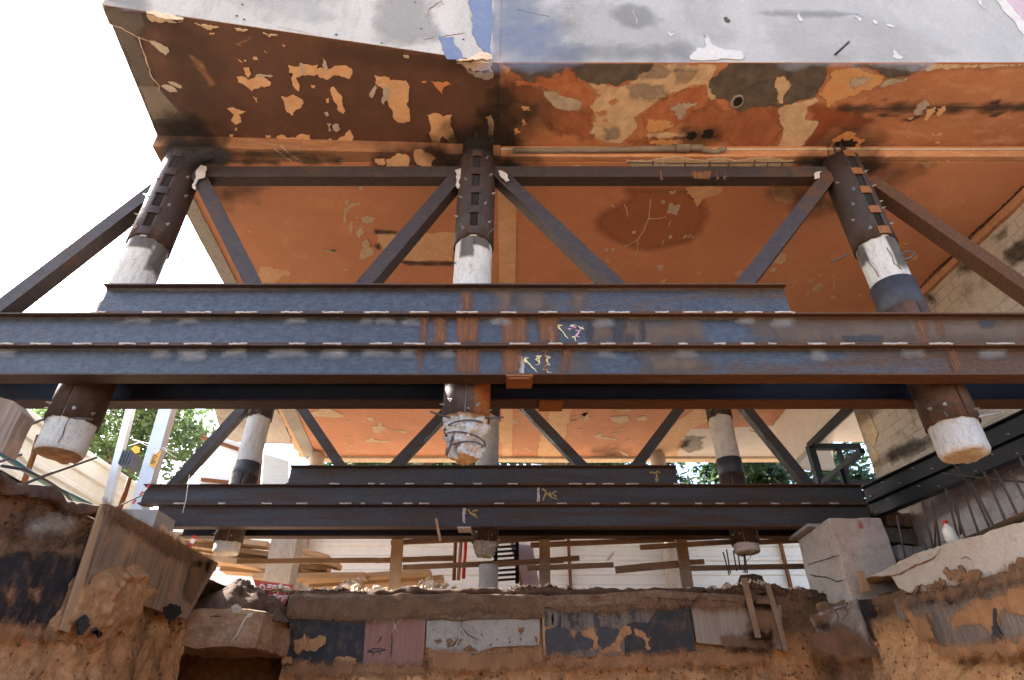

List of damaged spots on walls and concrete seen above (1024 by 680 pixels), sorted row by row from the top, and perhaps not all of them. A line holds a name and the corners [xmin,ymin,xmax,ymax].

flaking render [138,81,182,120]
peeling [237,52,272,103]
peeling [281,59,354,141]
peeling [369,75,410,123]
spalling [439,0,1024,166]
peeling [375,113,454,166]
crack [624,199,672,257]
leakage [599,189,705,249]
rust [415,292,480,373]
rust [498,292,575,373]
rust [592,320,701,373]
crack [809,555,843,582]